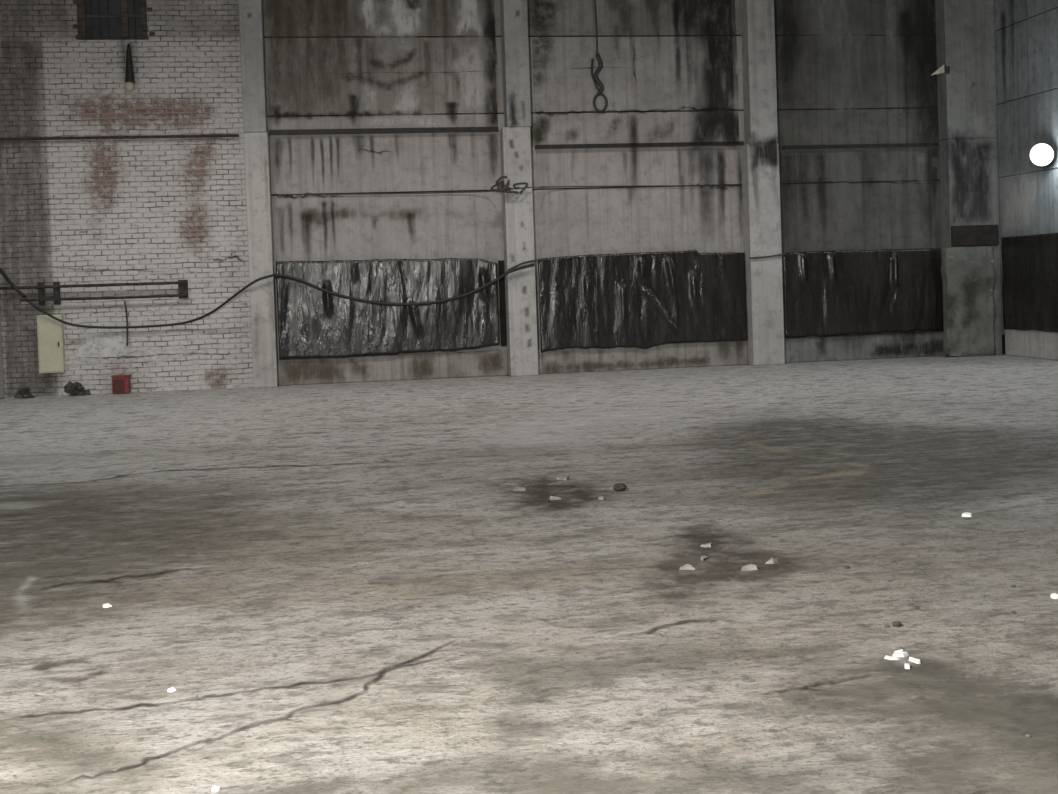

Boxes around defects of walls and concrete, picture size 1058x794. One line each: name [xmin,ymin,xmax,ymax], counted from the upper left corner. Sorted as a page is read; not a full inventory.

water stain [312,139,339,171]
water stain [701,151,725,199]
water stain [303,202,348,238]
crack [4,639,457,783]